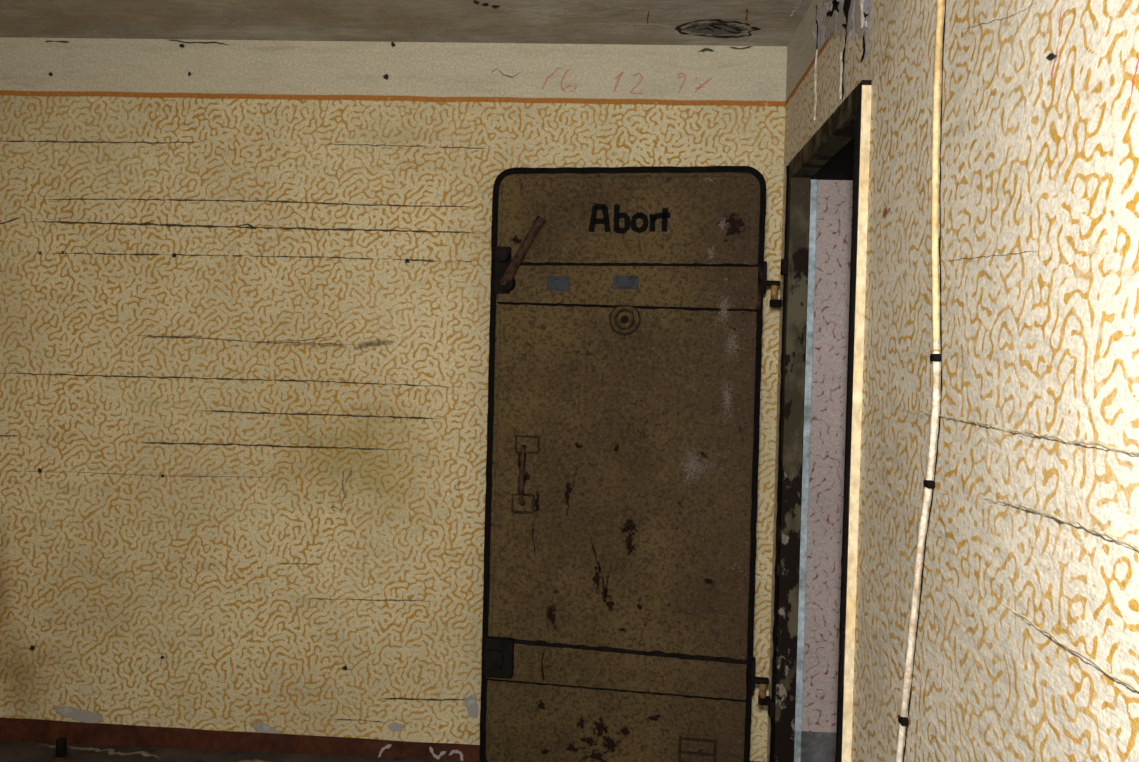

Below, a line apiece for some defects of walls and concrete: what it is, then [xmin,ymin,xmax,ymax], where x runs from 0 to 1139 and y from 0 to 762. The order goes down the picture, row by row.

crack [4,138,194,146]
crack [322,142,483,150]
crack [903,409,1139,457]
crack [981,498,1139,553]
crack [1001,602,1139,694]
corrosion [566,716,630,762]